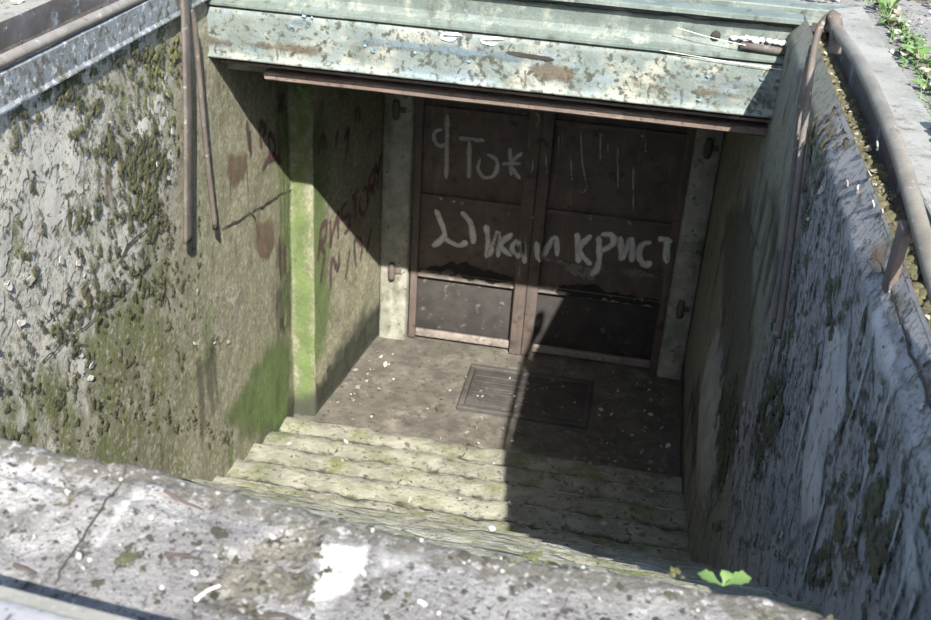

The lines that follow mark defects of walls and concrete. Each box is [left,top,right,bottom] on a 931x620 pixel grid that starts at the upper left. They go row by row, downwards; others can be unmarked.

corrosion [525,62,574,84]
crack [222,189,292,230]
leakage [793,299,900,590]
leakage [874,511,922,620]